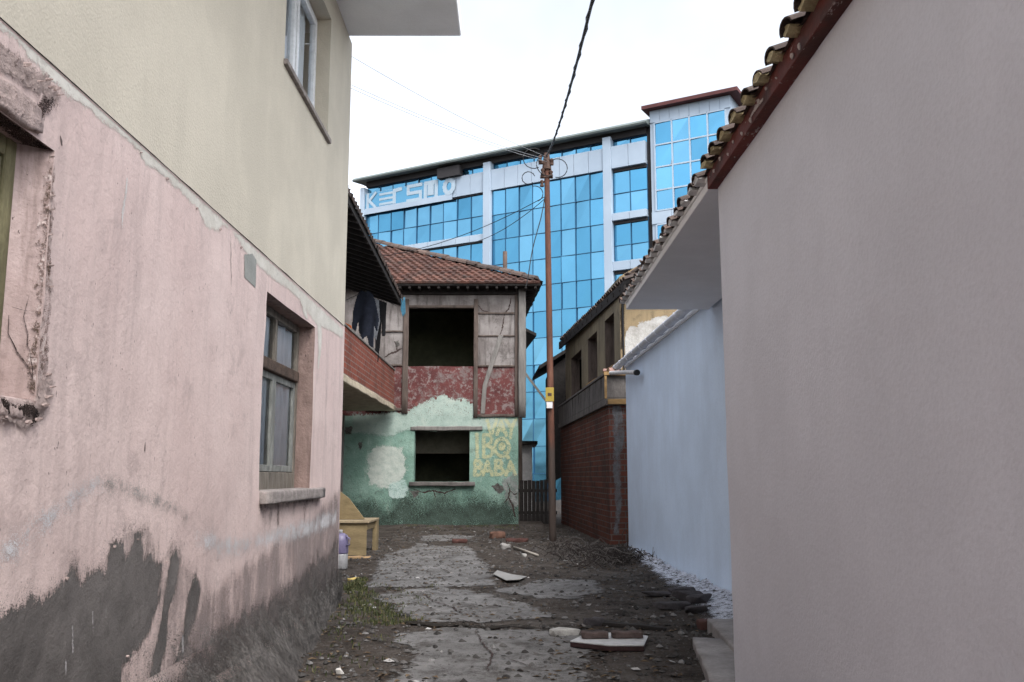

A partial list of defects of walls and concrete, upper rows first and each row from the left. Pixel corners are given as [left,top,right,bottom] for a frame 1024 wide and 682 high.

flaking render [0,22,343,337]
spalling [0,155,56,431]
water stain [166,480,518,682]
peeling [345,394,518,500]
crack [504,483,517,517]